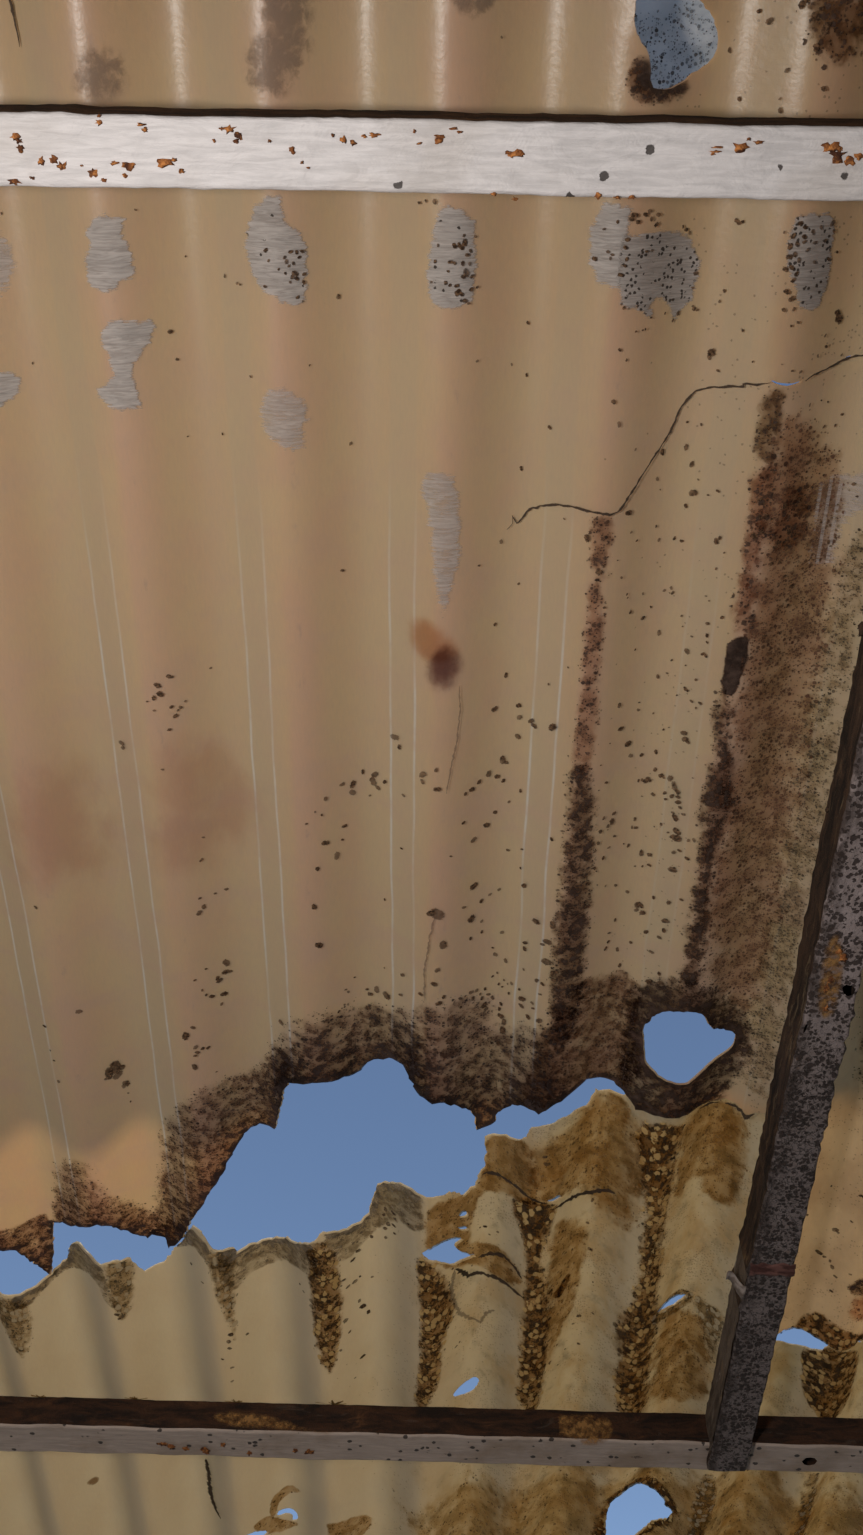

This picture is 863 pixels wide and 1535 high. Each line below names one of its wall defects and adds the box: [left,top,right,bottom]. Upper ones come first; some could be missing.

leakage [796,0,863,92]
leakage [263,248,306,299]
leakage [430,234,479,305]
leakage [592,209,661,277]
leakage [782,220,838,327]
leakage [817,309,843,358]
crack [806,355,863,381]
crack [511,383,768,525]
leakage [0,386,863,1274]
crack [482,1171,615,1209]
crack [449,1251,522,1323]